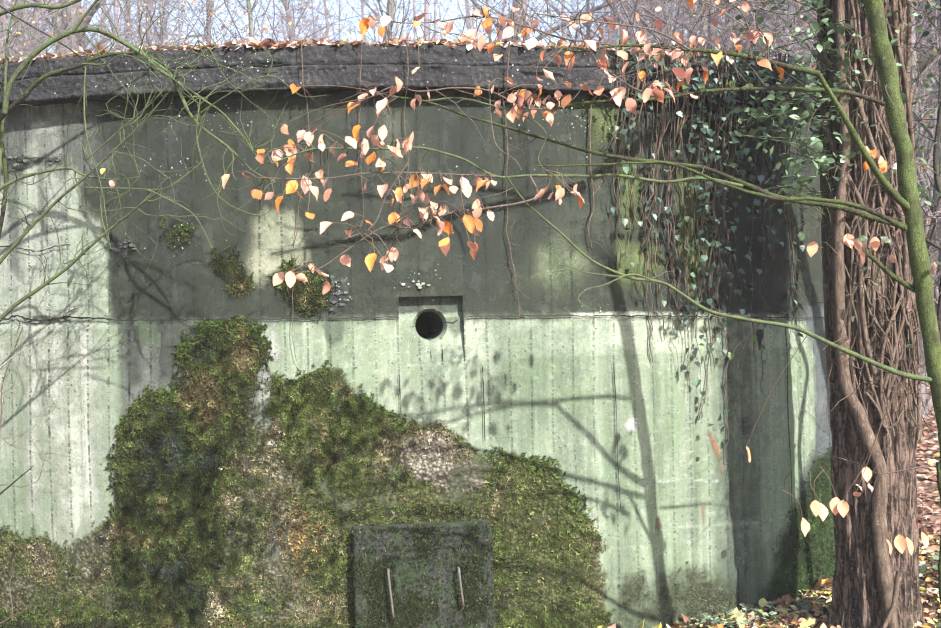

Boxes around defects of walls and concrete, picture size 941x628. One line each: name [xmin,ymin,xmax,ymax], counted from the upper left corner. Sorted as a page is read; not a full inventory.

crack [3,307,413,332]
water stain [0,91,832,603]